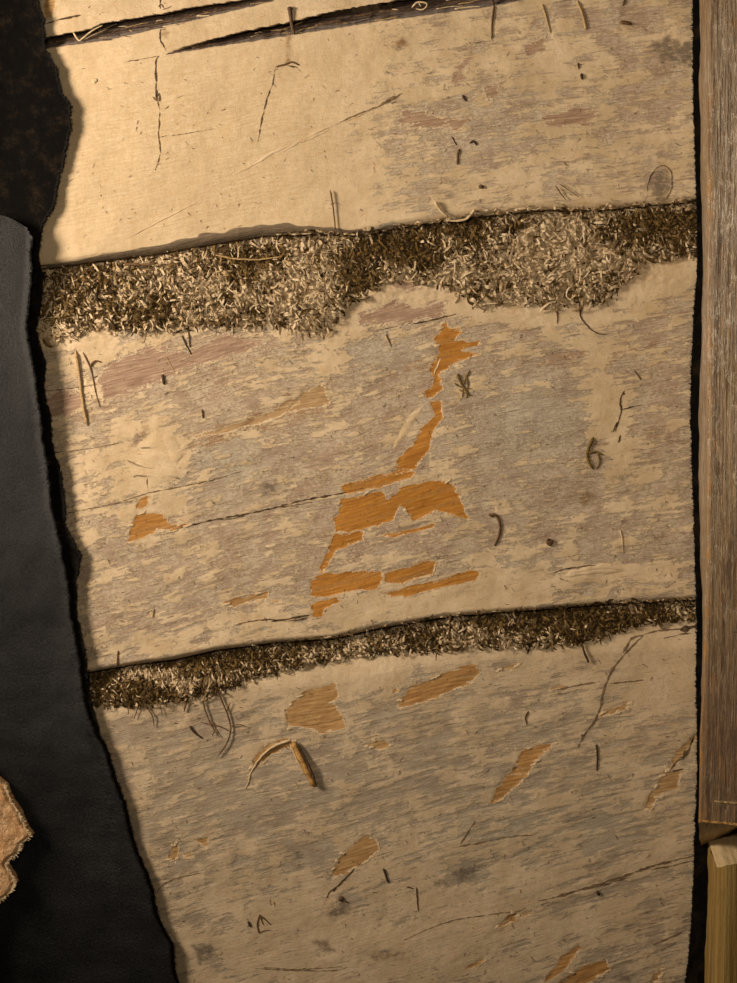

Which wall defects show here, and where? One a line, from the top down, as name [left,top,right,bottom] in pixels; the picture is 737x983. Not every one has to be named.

crack [44,0,519,170]
peeling [308,279,483,619]
crack [68,471,241,513]
peeling [125,494,193,545]
crack [176,488,363,529]
peeling [391,661,481,710]
peeling [248,680,346,772]
peeling [490,740,558,805]
peeling [330,833,380,879]
peeling [542,942,611,983]